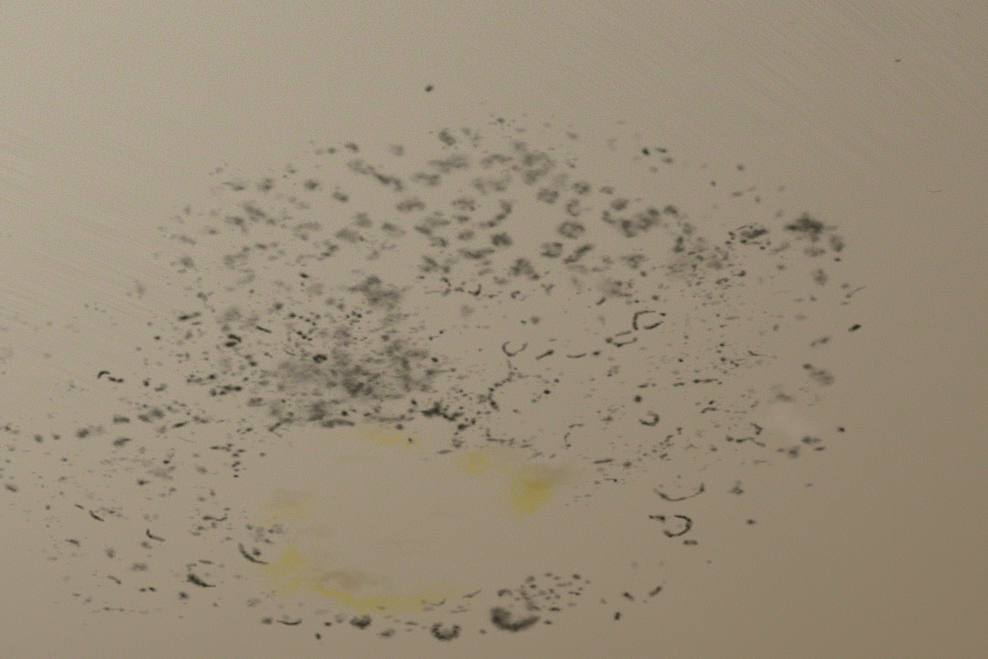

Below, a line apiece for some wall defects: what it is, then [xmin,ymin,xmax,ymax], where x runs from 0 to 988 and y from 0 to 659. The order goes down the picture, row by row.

water stain [412,391,479,429]
water stain [494,615,532,631]